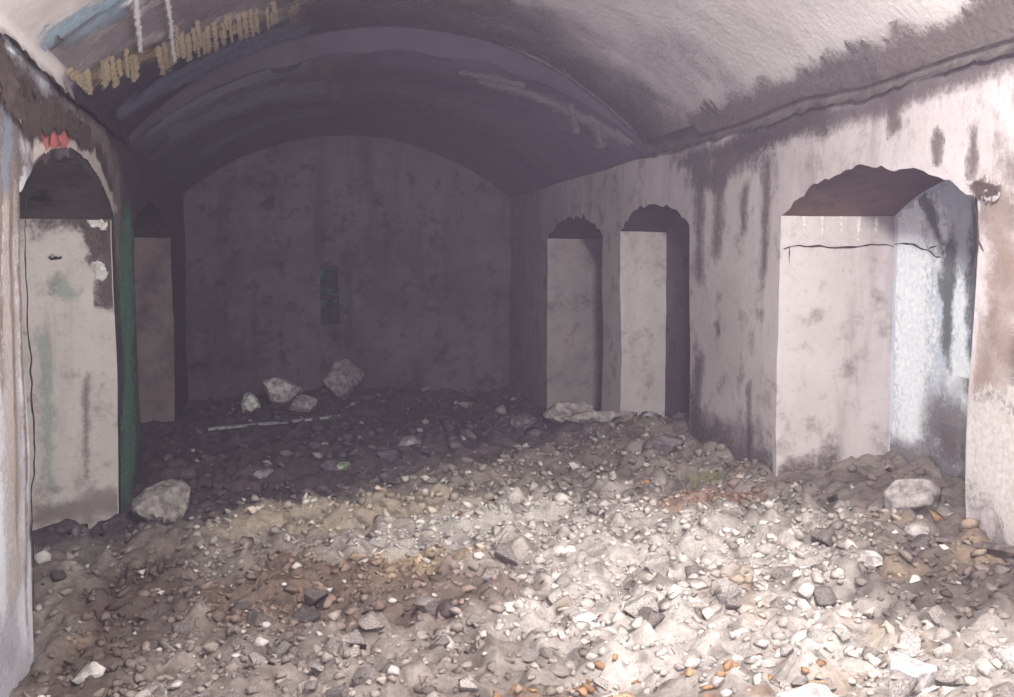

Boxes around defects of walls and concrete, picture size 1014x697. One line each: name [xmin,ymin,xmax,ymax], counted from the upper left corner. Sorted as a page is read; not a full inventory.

leakage [116,0,675,158]
leakage [678,53,1014,280]
crack [783,243,941,263]
spalling [967,174,1001,205]
leakage [889,184,978,482]